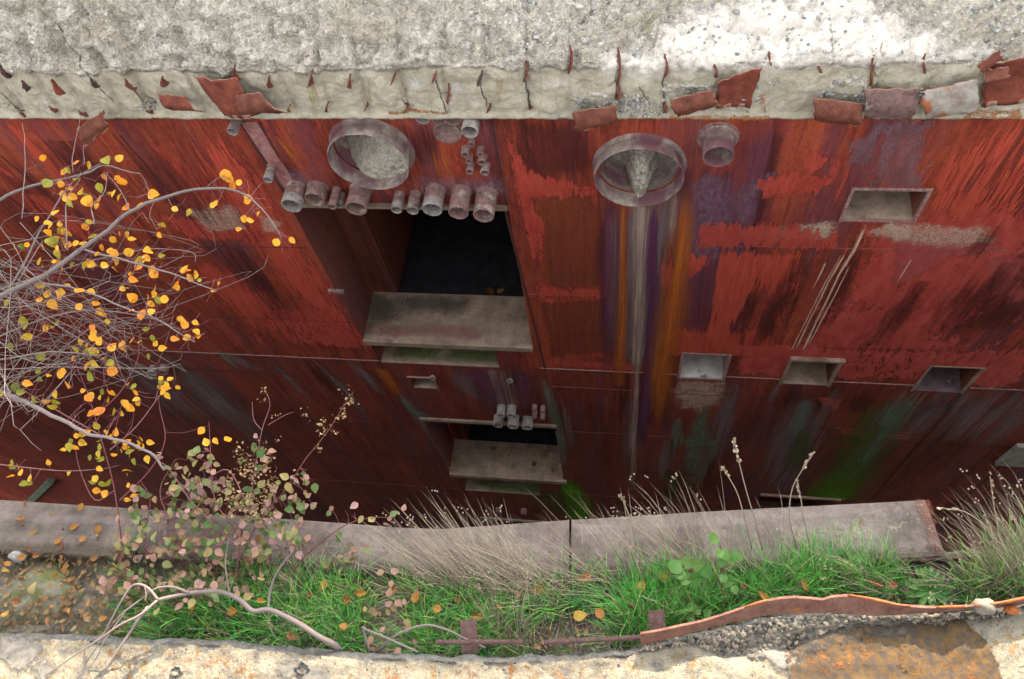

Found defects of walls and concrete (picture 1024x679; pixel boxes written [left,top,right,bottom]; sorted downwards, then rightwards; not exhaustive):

peeling [596,0,993,103]
peeling [507,138,603,263]
peeling [535,283,605,307]
rust [539,194,602,288]
rust [541,207,626,370]
rust [651,205,692,419]
damp [598,126,779,496]
peeling [659,118,1024,391]
rust [640,594,1024,679]